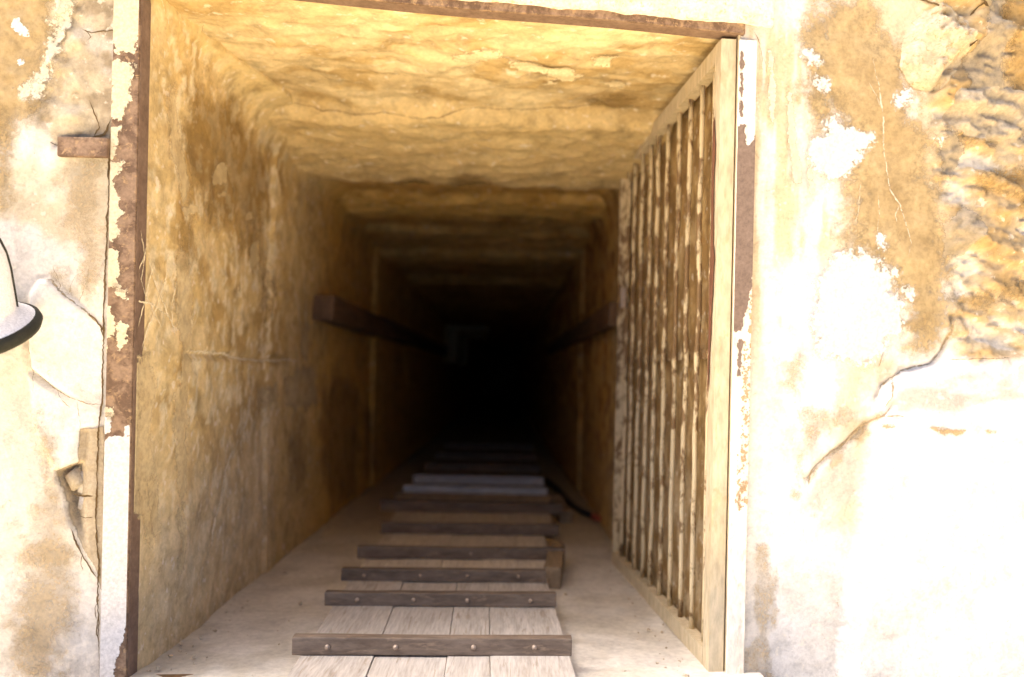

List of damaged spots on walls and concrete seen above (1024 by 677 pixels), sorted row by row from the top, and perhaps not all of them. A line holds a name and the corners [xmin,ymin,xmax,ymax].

spalling [11,17,30,37]
peeling [17,0,78,101]
peeling [799,49,832,94]
peeling [890,88,913,110]
peeling [806,114,875,191]
damp [767,0,959,352]
corrosion [734,51,755,511]
crack [808,324,1009,483]